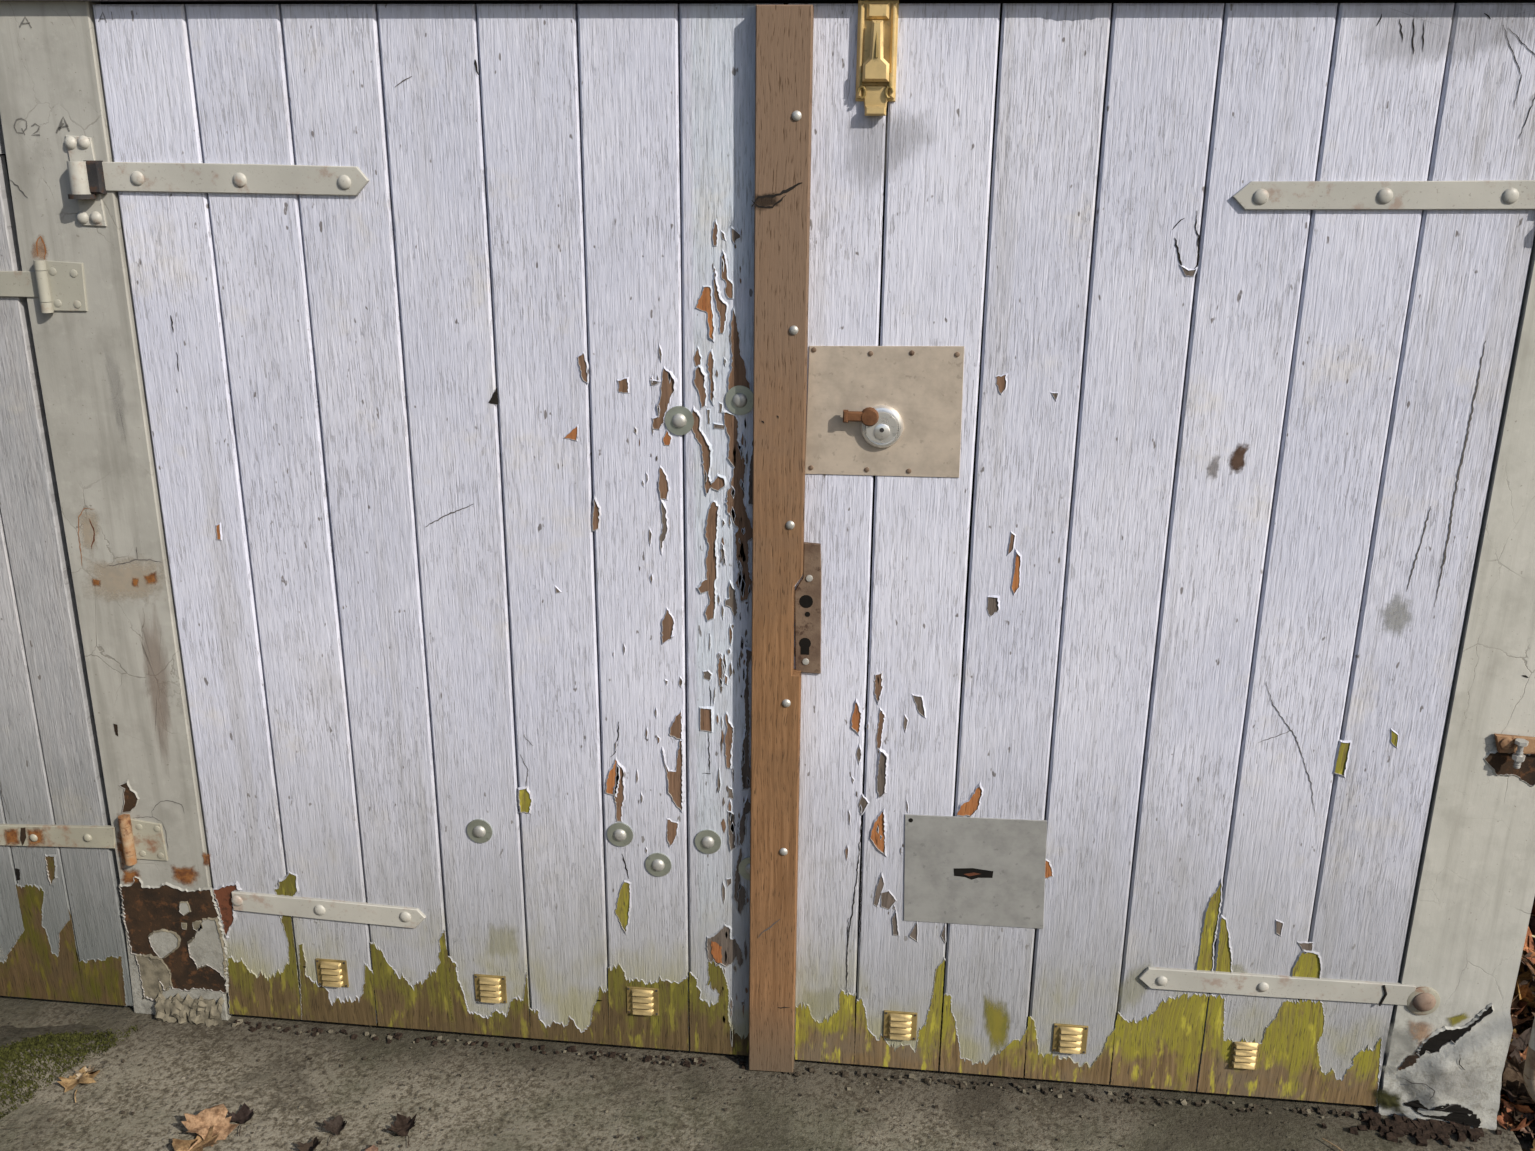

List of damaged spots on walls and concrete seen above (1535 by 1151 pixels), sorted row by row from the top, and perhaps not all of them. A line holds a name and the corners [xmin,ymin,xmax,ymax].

peeling [986,531,1022,617]
peeling [227,219,753,1056]
peeling [1390,728,1399,749]
peeling [1332,740,1352,778]
rust [1483,750,1535,787]
peeling [848,671,927,942]
peeling [955,782,984,817]
rust [5,828,44,846]
peeling [1045,859,1054,879]
peeling [1194,877,1233,973]
peeling [795,919,1383,1107]
spalling [1404,1100,1481,1128]